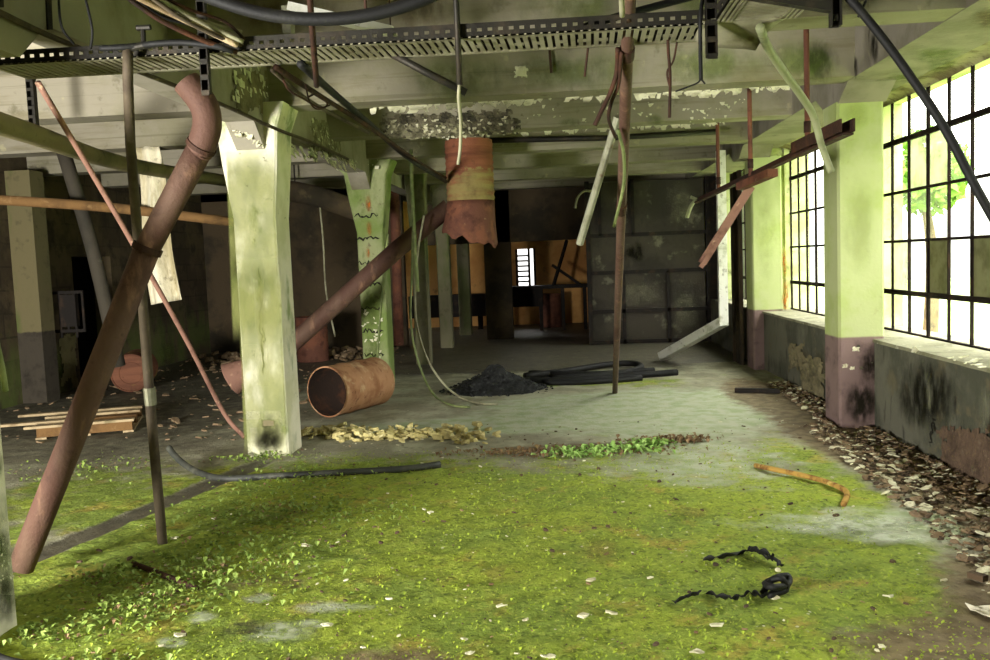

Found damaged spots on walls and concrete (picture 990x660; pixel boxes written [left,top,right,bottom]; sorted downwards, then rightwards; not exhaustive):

peeling [232,66,269,114]
spalling [370,98,556,141]
peeling [544,95,618,135]
peeling [632,86,790,130]
peeling [291,117,357,172]
water stain [228,166,285,439]
water stain [903,368,949,423]
water stain [0,580,13,616]